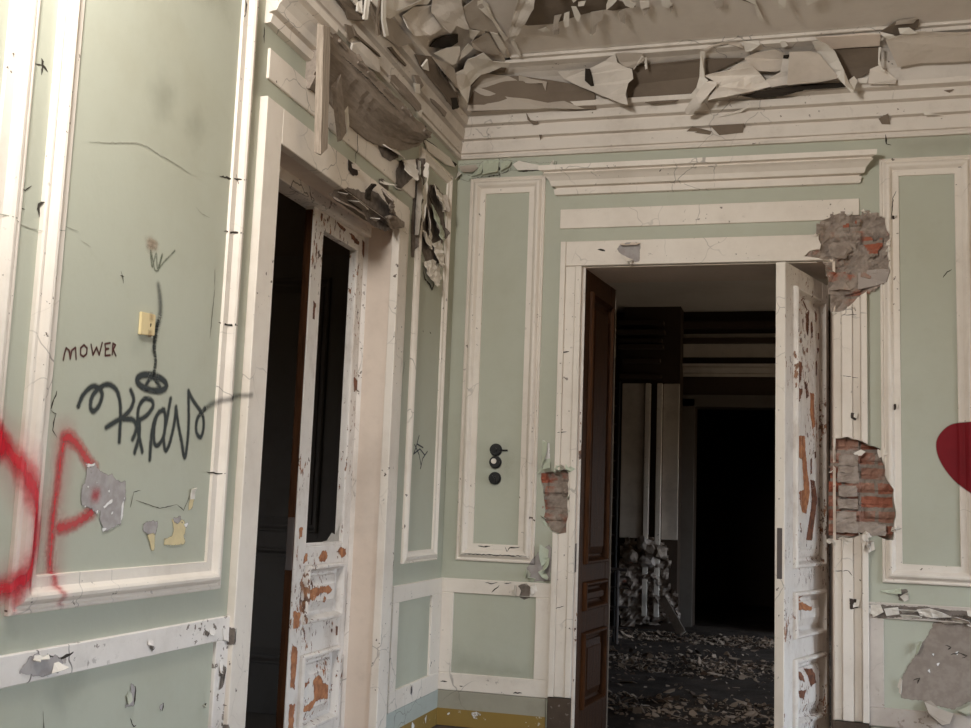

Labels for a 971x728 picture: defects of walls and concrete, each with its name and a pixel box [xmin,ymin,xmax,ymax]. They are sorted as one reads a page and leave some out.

peeling [381,0,919,115]
peeling [711,123,744,135]
peeling [329,144,451,290]
spalling [805,209,896,315]
spalling [81,463,126,532]
spalling [143,488,197,550]
spalling [537,440,575,534]
spalling [826,437,902,553]
peeling [512,544,551,600]
peeling [19,652,74,677]
spalling [849,588,971,725]